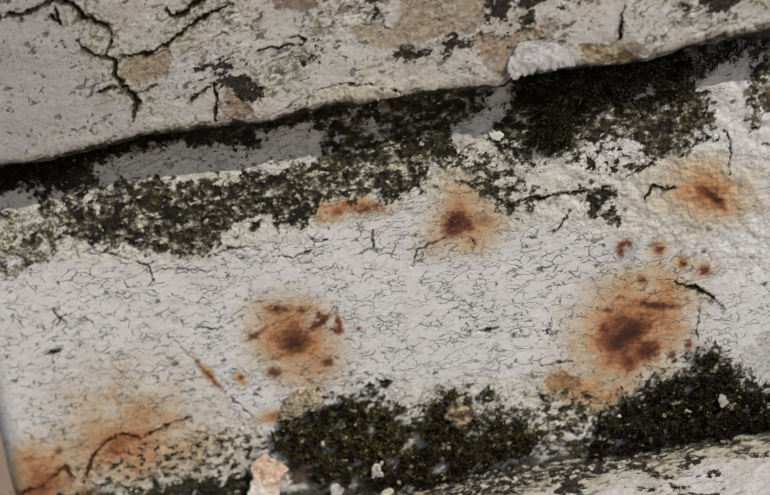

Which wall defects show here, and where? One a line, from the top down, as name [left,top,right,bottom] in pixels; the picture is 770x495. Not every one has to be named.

crack [0,0,234,122]
spalling [272,0,316,13]
spalling [350,0,647,80]
rust [314,197,385,224]
rust [428,180,503,254]
rust [657,158,751,223]
crack [137,246,259,286]
rust [247,299,343,390]
rust [546,239,713,411]
crack [674,280,725,337]
crack [20,416,192,495]
rust [10,386,214,495]